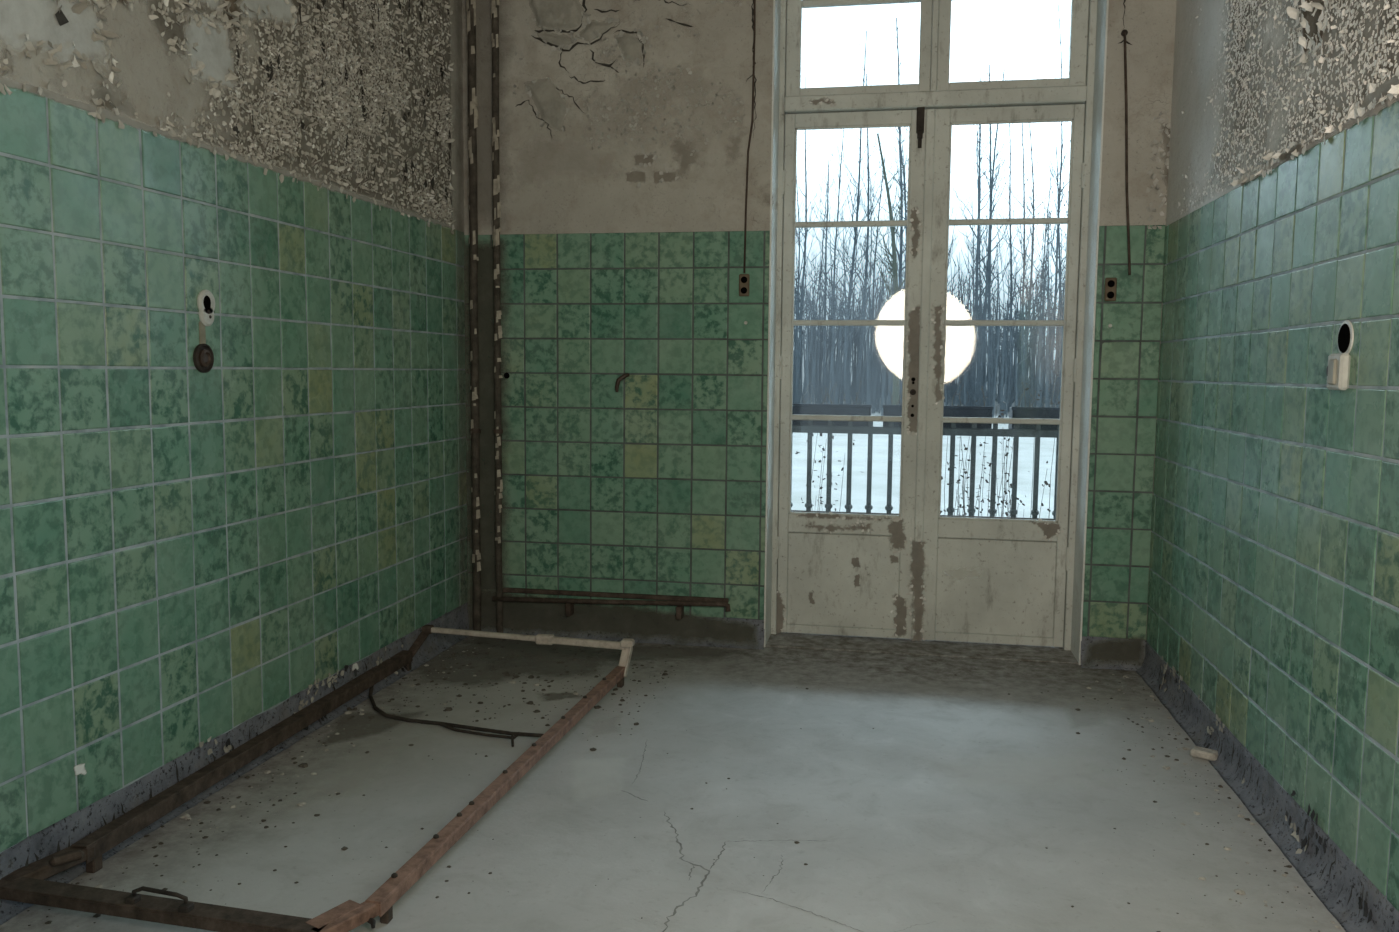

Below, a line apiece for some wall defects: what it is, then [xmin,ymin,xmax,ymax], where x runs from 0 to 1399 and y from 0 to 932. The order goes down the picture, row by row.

peeling [0,0,501,261]
crack [515,0,693,137]
crack [745,0,757,138]
peeling [1146,0,1399,229]
peeling [494,310,502,341]
peeling [471,411,503,543]
crack [621,741,935,932]